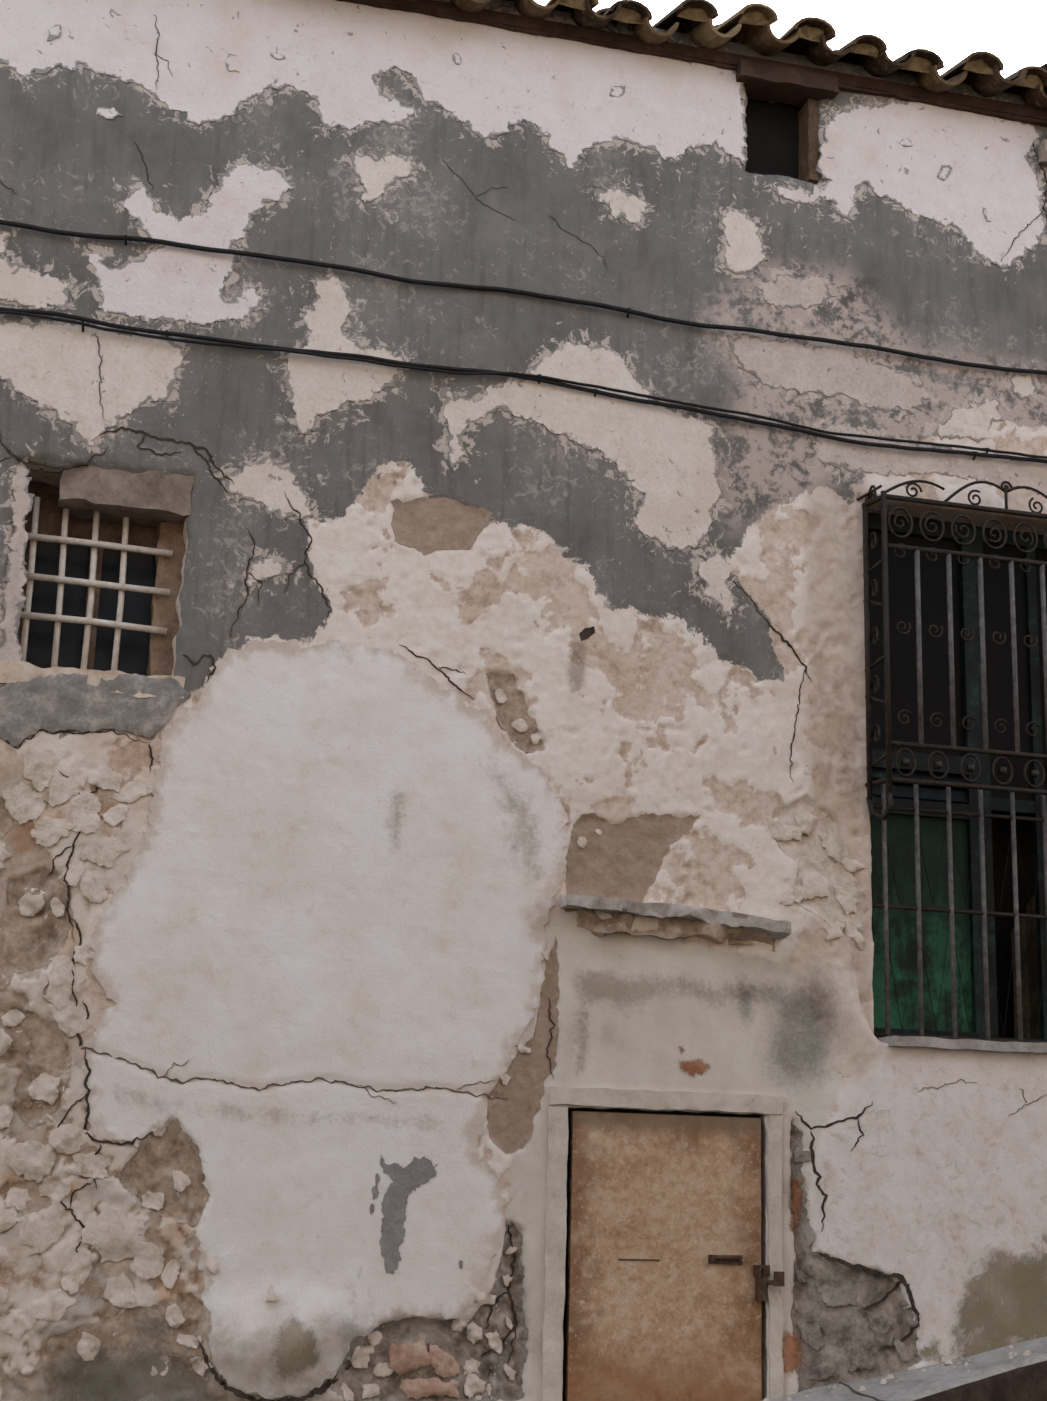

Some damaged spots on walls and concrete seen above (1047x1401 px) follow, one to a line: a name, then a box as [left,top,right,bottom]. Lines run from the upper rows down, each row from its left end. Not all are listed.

peeling [0,0,748,169]
peeling [769,101,1047,270]
crack [0,333,234,493]
peeling [0,162,295,447]
peeling [284,275,406,435]
peeling [440,341,739,617]
crack [183,494,331,684]
crack [733,581,812,783]
crack [44,770,508,1253]
rust [680,1047,709,1076]
spalling [331,1219,529,1401]
crack [795,1101,920,1351]